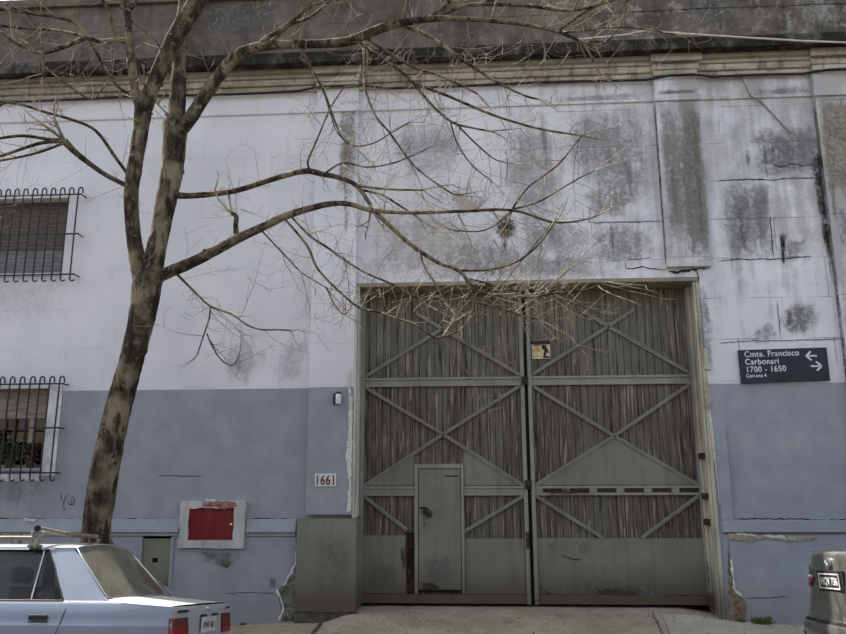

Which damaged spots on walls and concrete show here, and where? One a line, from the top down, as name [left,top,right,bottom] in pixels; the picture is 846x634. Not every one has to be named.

damp [573,120,642,211]
damp [654,106,708,261]
crack [601,219,809,283]
damp [731,189,768,248]
crack [719,148,816,181]
damp [758,103,846,378]
spalling [276,551,296,621]
corrosion [401,537,438,593]
spalling [727,533,817,621]